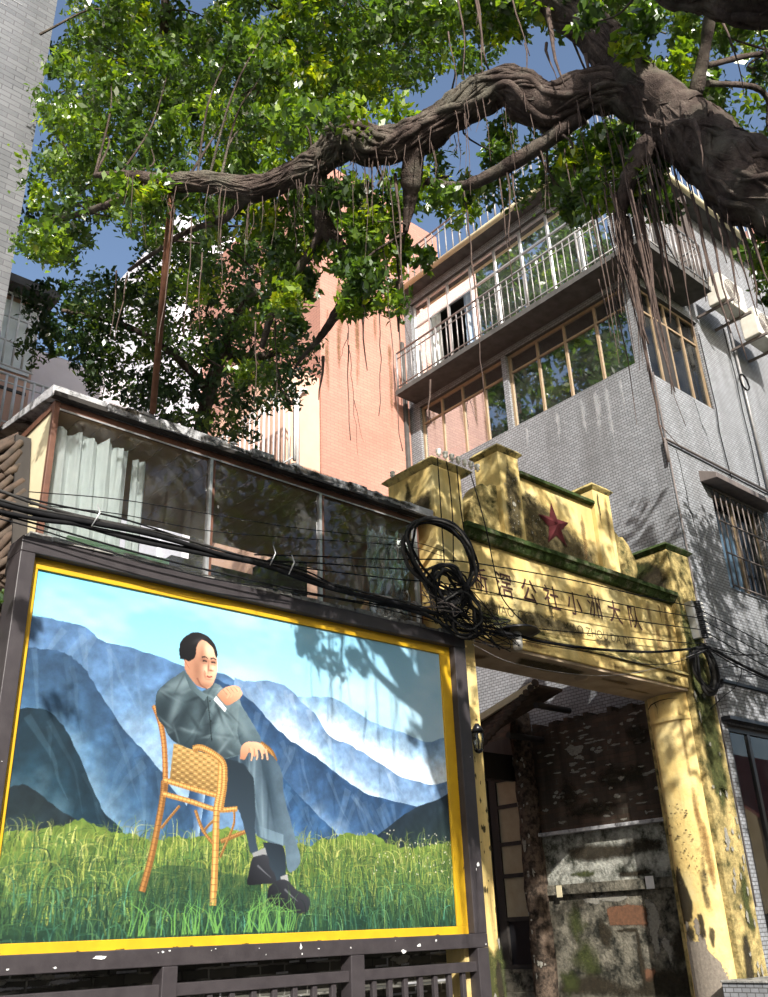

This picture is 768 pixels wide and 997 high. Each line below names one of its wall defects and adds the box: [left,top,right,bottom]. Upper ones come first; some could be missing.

leakage [505,463,596,564]
peeling [537,710,655,820]
leakage [583,895,628,904]
leakage [561,899,691,997]
peeling [668,804,729,997]